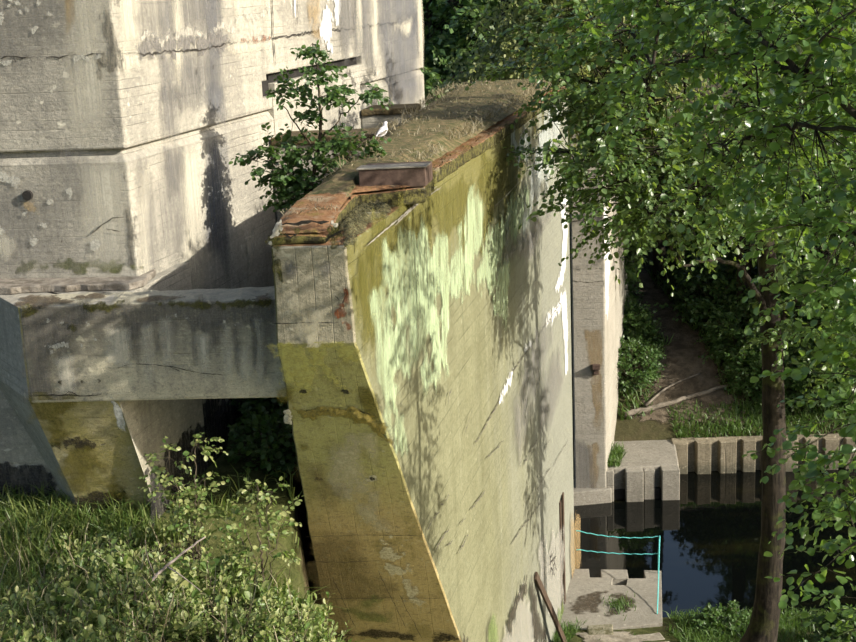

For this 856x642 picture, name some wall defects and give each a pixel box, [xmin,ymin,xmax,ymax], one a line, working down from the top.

damp [123,0,254,133]
crack [1,0,414,73]
damp [167,140,228,273]
rust [334,289,351,330]
damp [370,109,560,451]
crack [119,364,221,375]
damp [0,292,360,525]
rust [585,331,602,415]
damp [309,544,416,642]
damp [432,633,468,642]
damp [507,574,546,642]